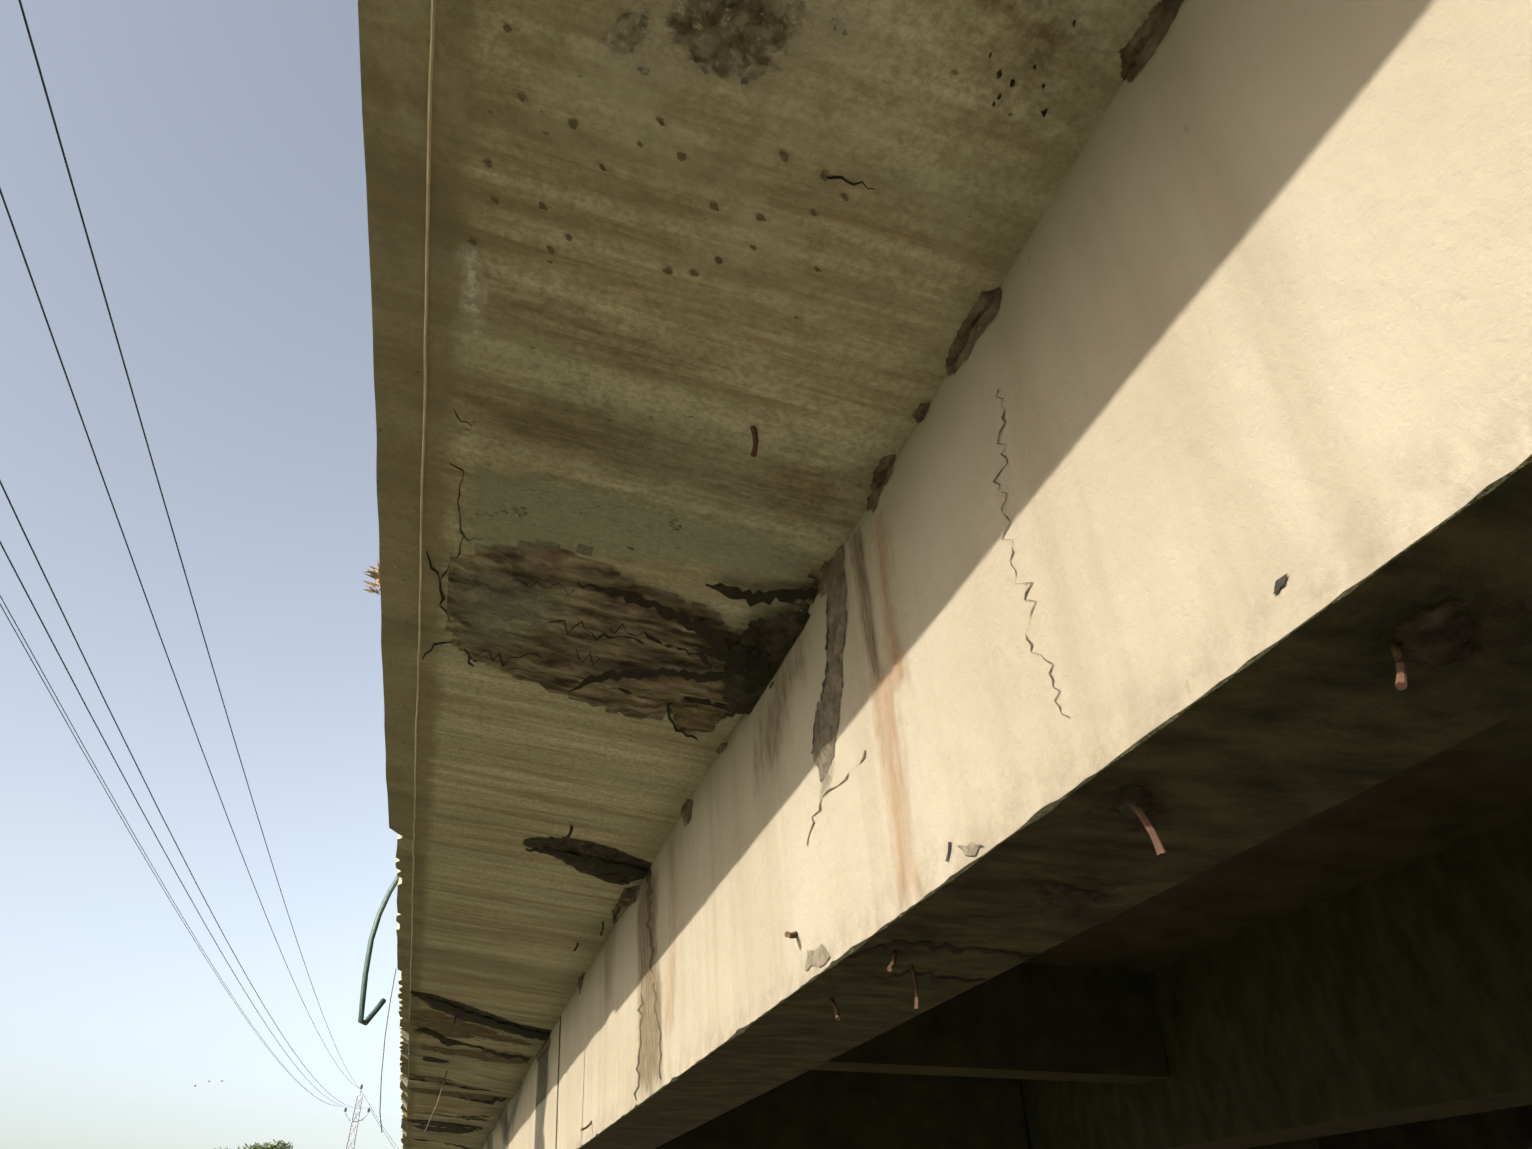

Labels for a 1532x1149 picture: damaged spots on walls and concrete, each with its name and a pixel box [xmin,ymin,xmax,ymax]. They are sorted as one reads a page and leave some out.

spalling [1119,0,1184,83]
spalling [946,287,1002,376]
spalling [750,426,759,457]
spalling [913,402,930,423]
spalling [866,454,896,514]
spalling [446,540,847,789]
spalling [680,799,693,828]
spalling [523,826,652,936]
spalling [407,991,552,1149]